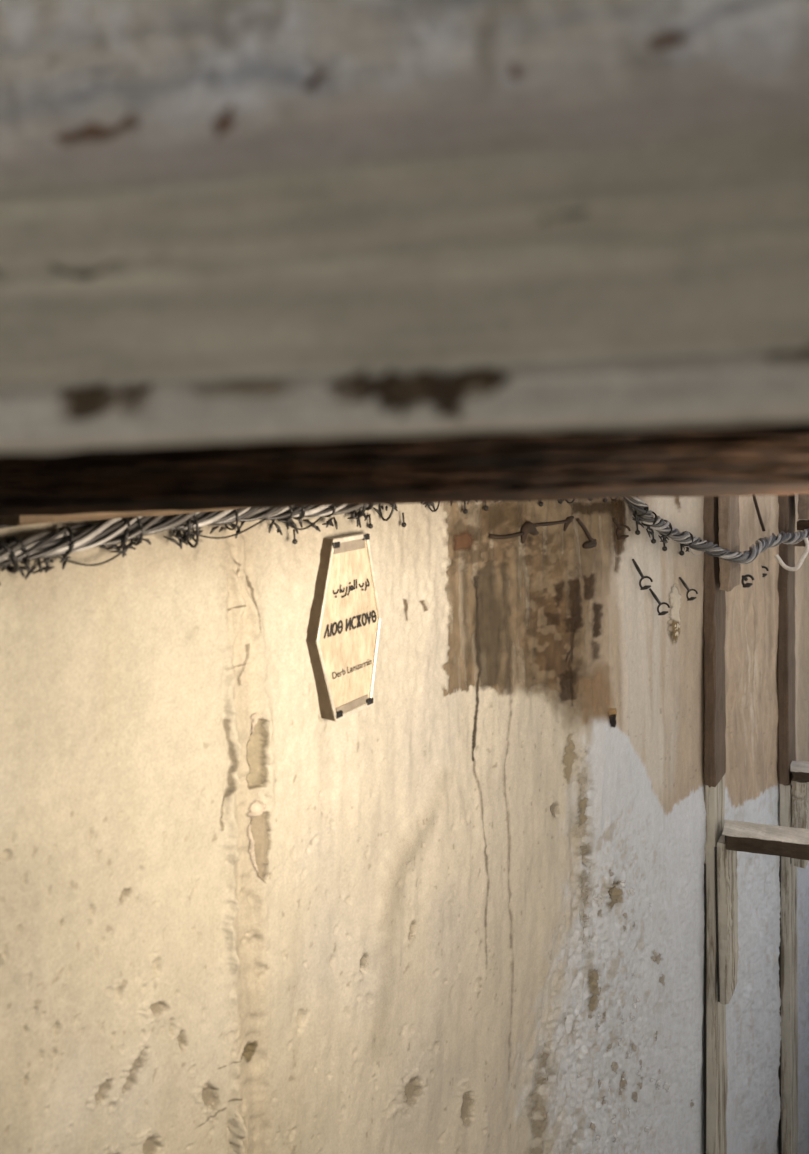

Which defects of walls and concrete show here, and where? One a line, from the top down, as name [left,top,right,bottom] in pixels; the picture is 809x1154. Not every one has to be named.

peeling [329,368,510,419]
damp [573,500,626,571]
crack [472,576,481,784]
damp [476,564,510,693]
flaking render [246,713,271,882]
flaking render [243,1041,257,1062]